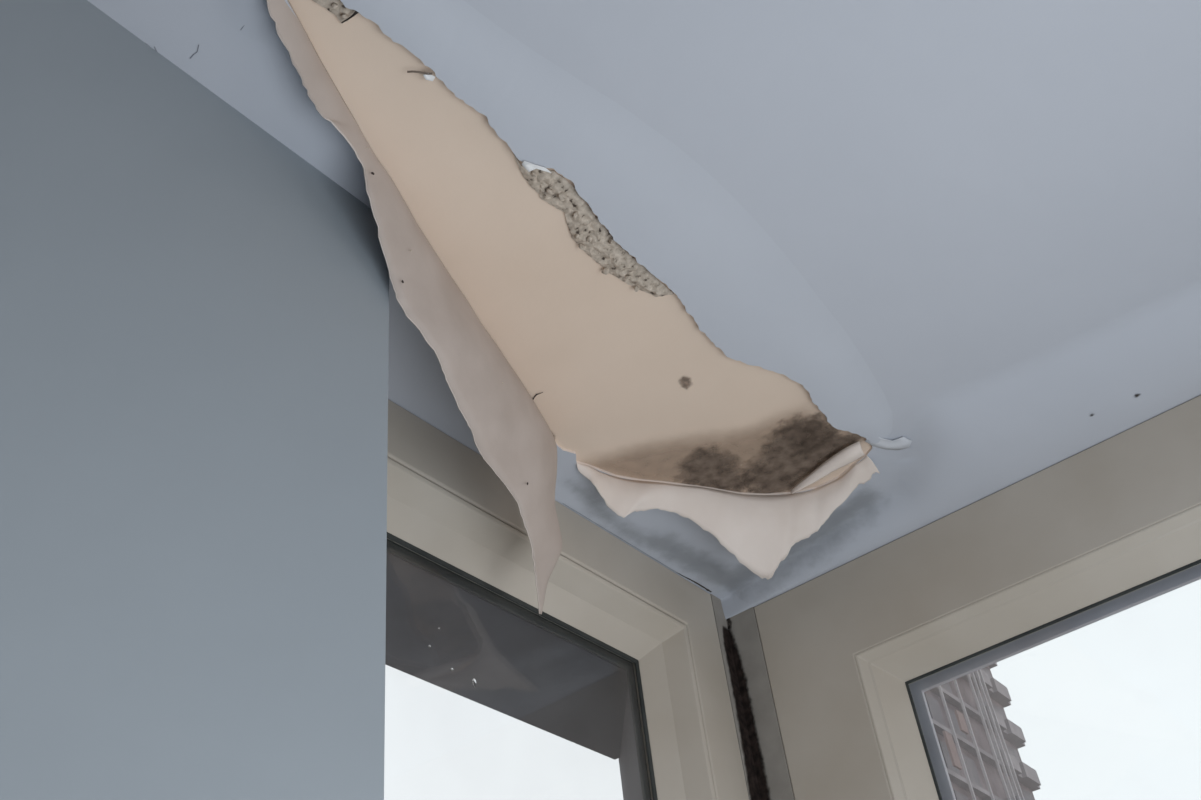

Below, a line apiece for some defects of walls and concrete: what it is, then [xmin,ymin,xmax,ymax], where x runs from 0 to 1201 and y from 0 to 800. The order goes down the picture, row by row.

peeling [266,0,912,614]
damp [608,415,861,494]